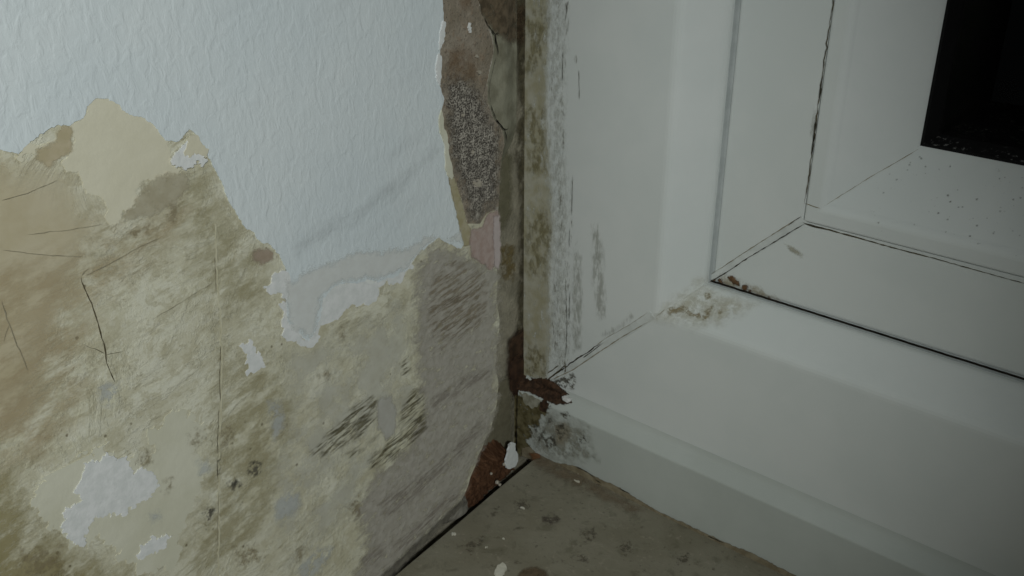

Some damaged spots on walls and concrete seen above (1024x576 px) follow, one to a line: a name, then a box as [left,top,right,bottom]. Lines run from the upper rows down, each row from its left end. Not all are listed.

crack [81,270,123,380]
peeling [0,0,518,576]
corrosion [509,355,572,412]
damp [483,0,1024,457]